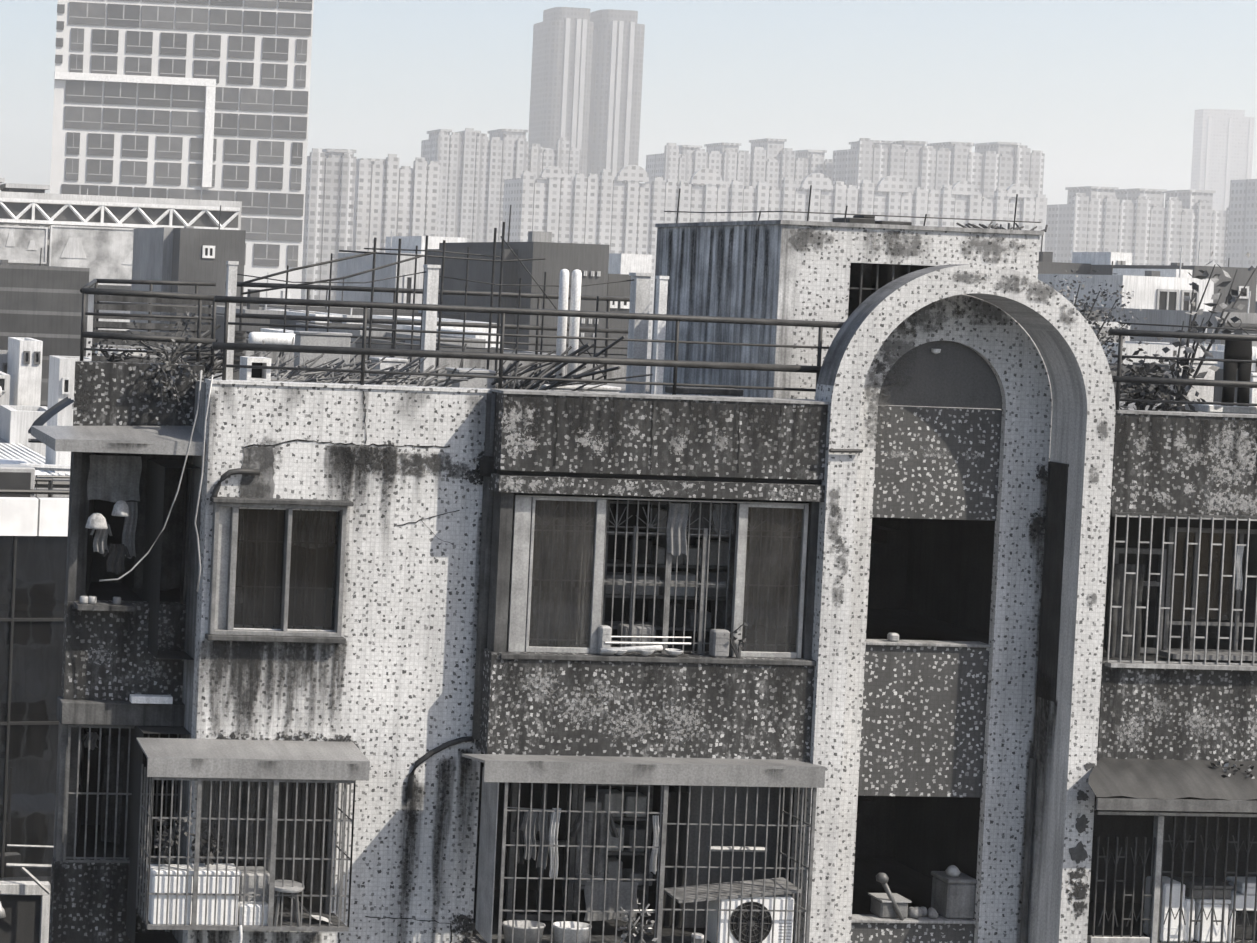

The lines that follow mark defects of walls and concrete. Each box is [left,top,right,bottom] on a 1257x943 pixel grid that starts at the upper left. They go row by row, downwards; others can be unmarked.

water stain [668,228,769,315]
water stain [325,442,484,500]
water stain [1116,416,1257,456]
water stain [201,641,366,748]
water stain [1028,606,1057,783]
water stain [403,750,473,892]